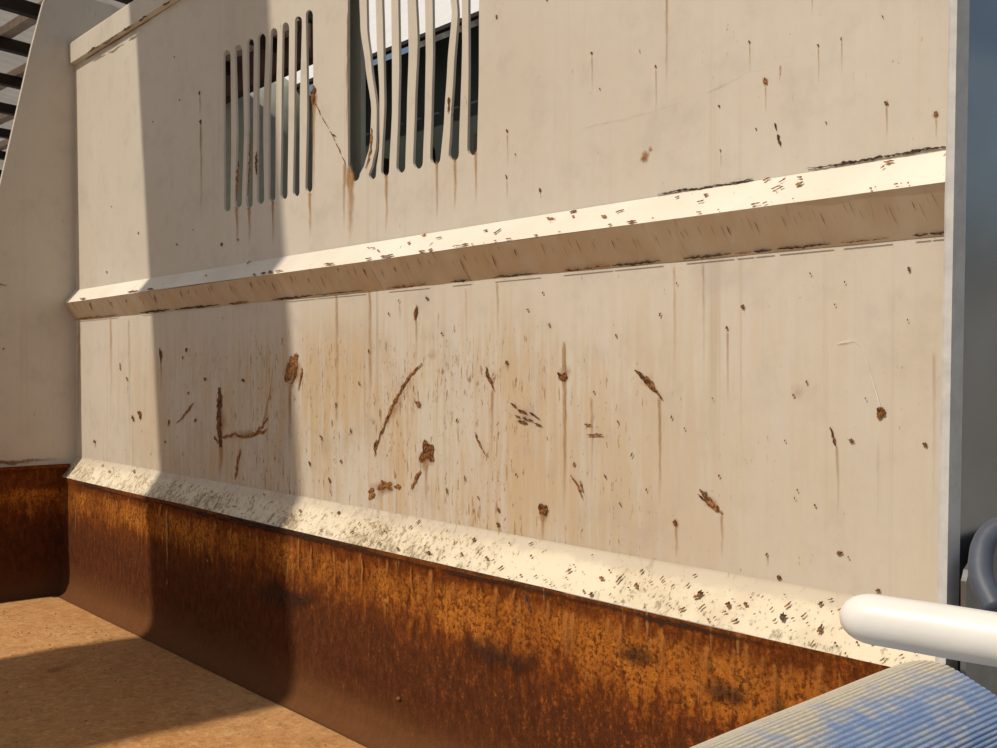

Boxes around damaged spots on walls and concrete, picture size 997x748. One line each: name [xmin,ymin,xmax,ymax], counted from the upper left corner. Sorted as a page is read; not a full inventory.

corrosion [343,164,353,215]
corrosion [284,353,303,414]
peeling [865,365,885,419]
corrosion [368,439,434,500]
corrosion [82,484,748,664]